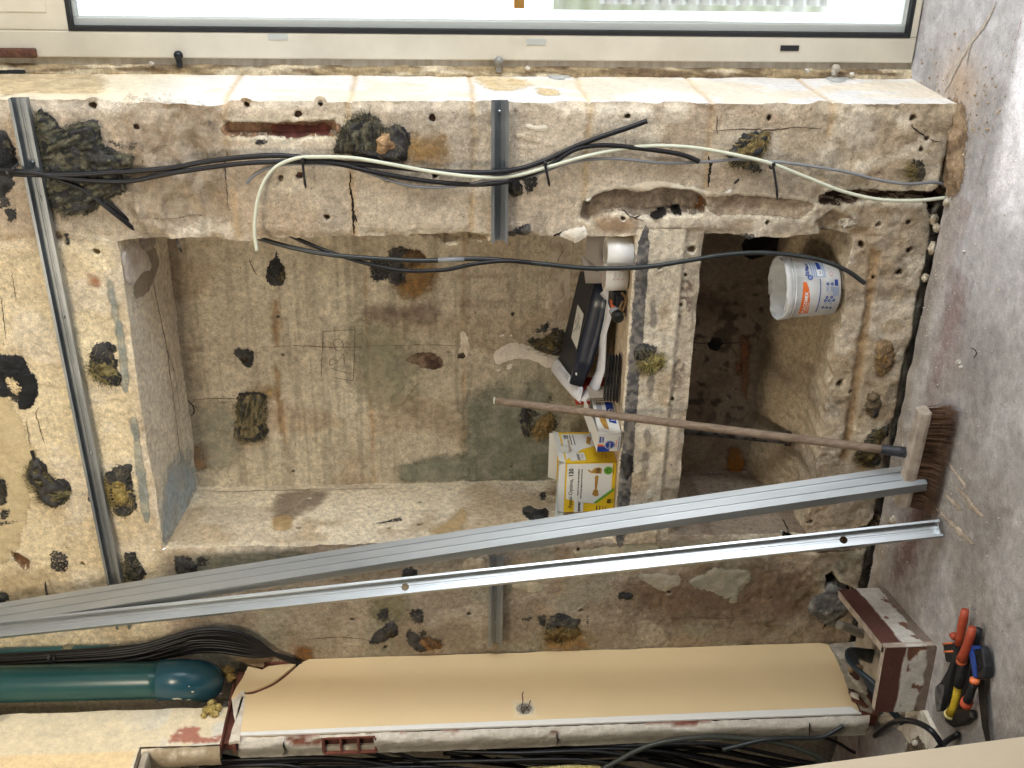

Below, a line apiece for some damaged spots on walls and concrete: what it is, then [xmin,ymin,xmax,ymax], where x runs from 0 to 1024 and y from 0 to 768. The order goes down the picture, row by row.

crack [349,173,357,234]
spalling [545,180,945,320]
peeling [638,567,751,604]